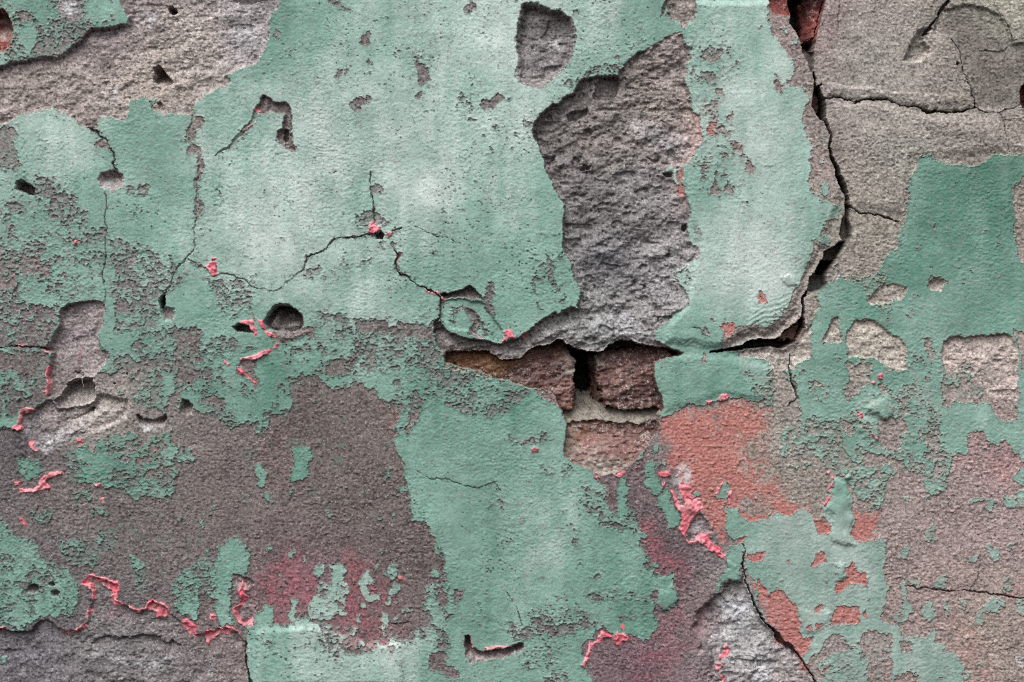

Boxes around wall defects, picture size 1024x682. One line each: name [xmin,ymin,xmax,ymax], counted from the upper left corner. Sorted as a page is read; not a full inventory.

peeling [0,0,646,682]
crack [164,110,483,333]
spalling [433,0,1024,682]
crack [689,0,1024,407]
crack [741,544,816,682]